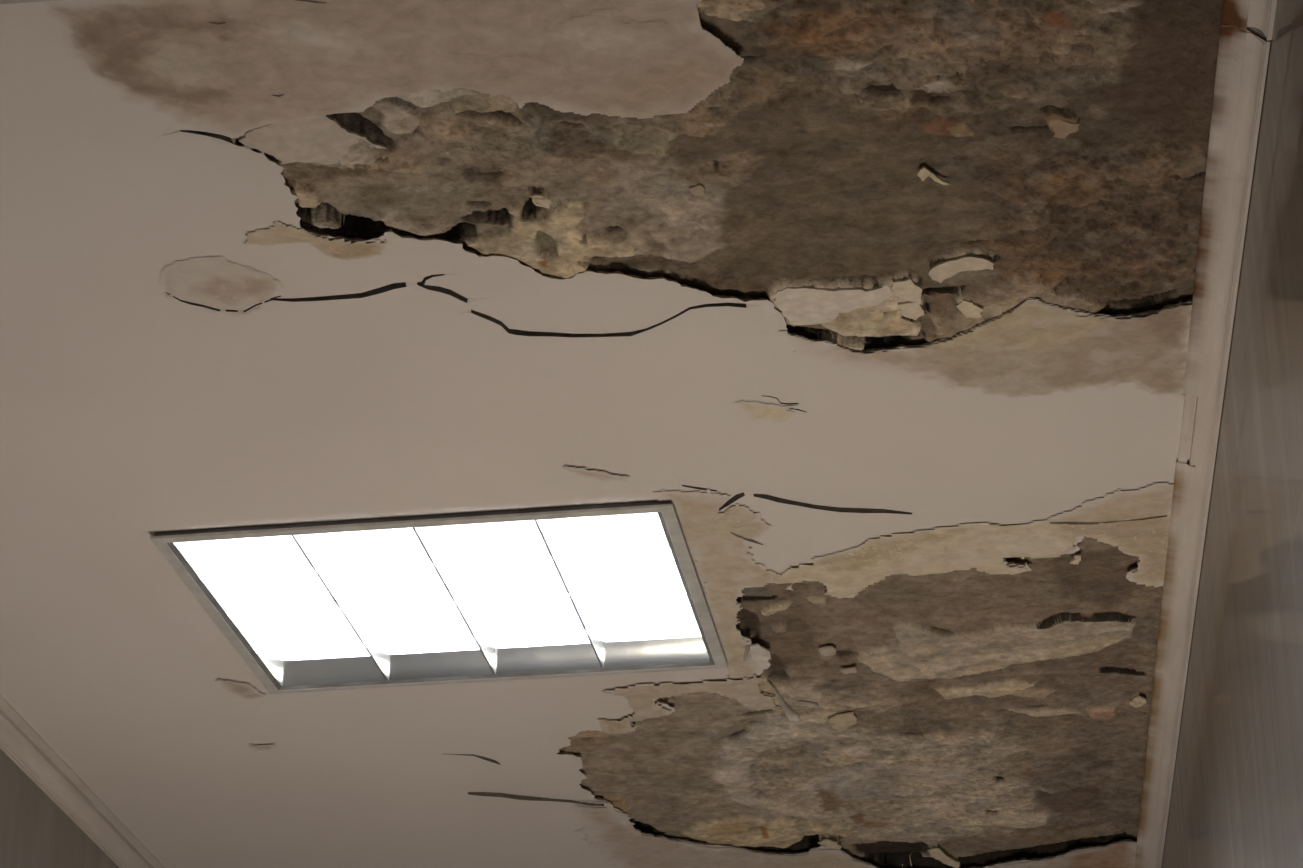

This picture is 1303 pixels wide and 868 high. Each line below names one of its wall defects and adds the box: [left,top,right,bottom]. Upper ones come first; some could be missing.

damp [43,0,744,145]
crack [180,130,237,145]
spalling [237,0,1223,351]
crack [166,274,747,337]
damp [779,299,1192,400]
crack [682,485,912,545]
spalling [558,489,1169,868]
damp [988,462,1195,868]
crack [451,754,604,806]
damp [573,800,874,868]